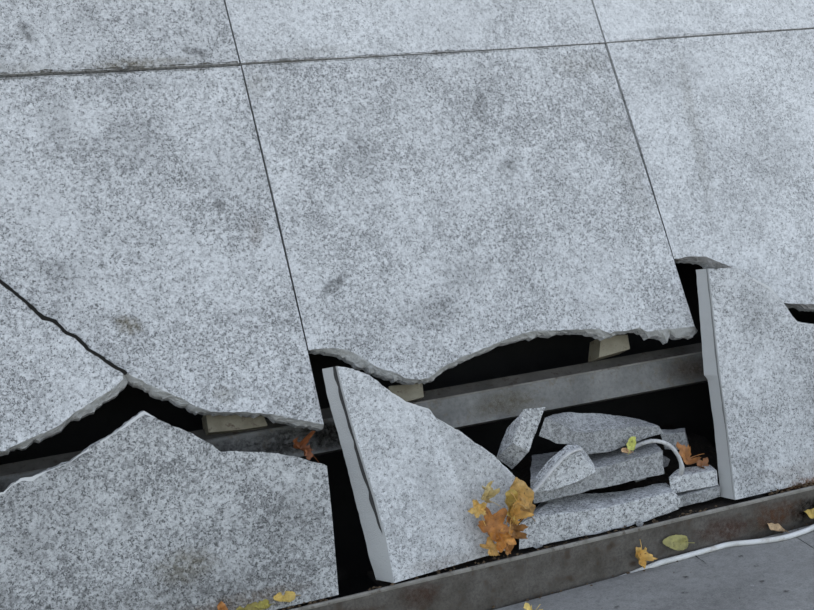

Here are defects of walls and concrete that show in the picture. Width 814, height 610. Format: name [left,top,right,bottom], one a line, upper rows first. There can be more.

spalling [676,256,732,268]
crack [0,279,128,375]
spalling [309,326,698,383]
spalling [4,374,324,453]